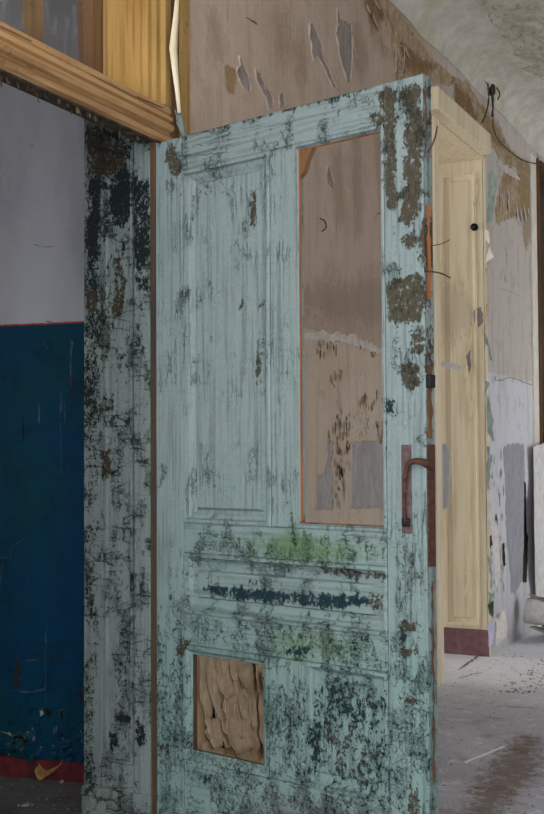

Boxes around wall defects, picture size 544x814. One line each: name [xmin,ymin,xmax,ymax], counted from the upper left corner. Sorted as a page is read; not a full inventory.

water stain [365,0,383,31]
peeling [235,55,286,111]
peeling [308,7,358,90]
water stain [399,38,435,73]
flaking render [366,0,530,227]
water stain [454,84,476,120]
peeling [3,707,84,764]